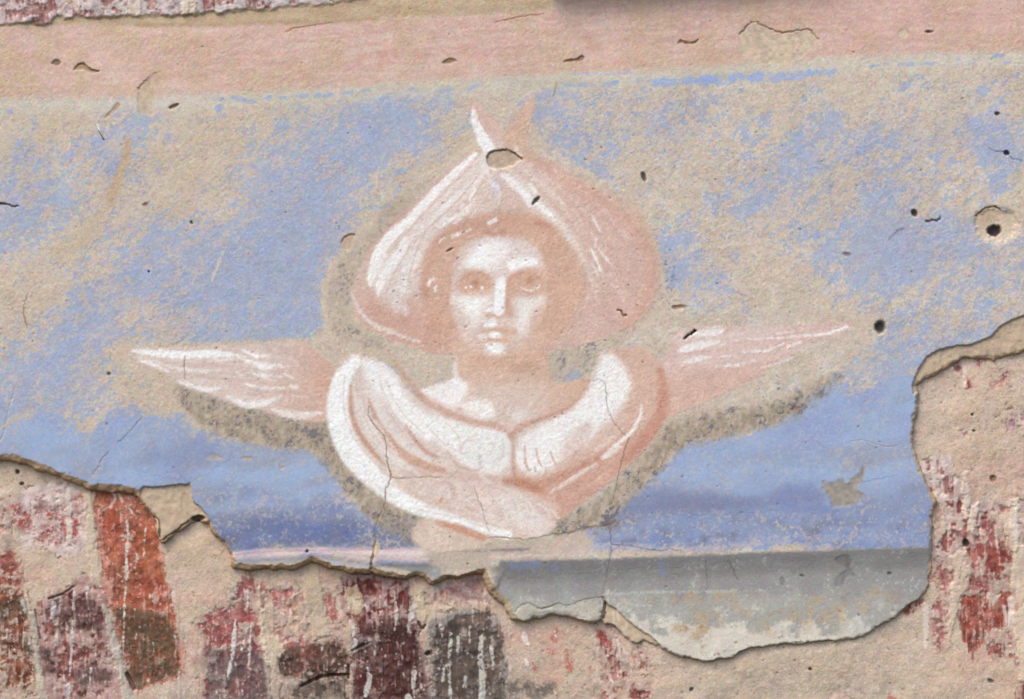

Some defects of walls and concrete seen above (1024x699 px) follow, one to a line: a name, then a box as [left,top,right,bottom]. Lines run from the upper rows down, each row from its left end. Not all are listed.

spalling [486,148,523,169]
crack [367,406,443,570]
spalling [0,349,1024,699]
crack [474,379,739,620]